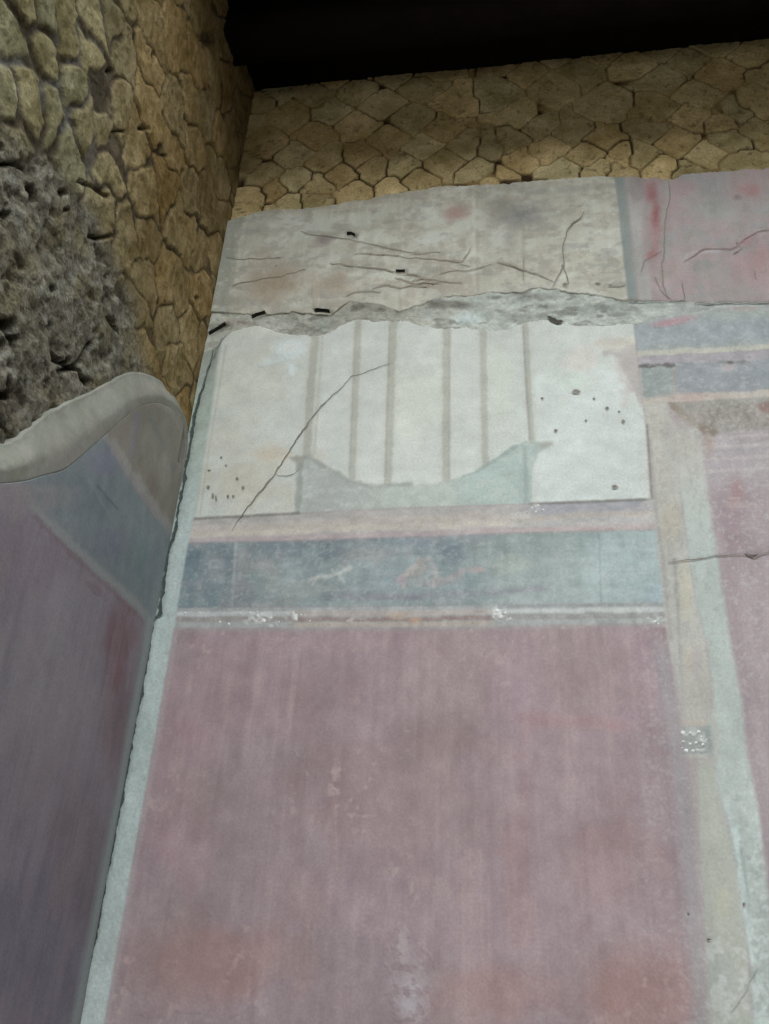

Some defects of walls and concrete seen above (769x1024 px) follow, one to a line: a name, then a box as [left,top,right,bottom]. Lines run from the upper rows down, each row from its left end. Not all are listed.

crack [226,257,306,286]
crack [301,212,584,297]
crack [608,183,769,305]
spalling [204,282,769,353]
crack [547,316,563,324]
crack [232,364,388,530]
crack [670,552,769,563]
leakage [680,726,711,754]